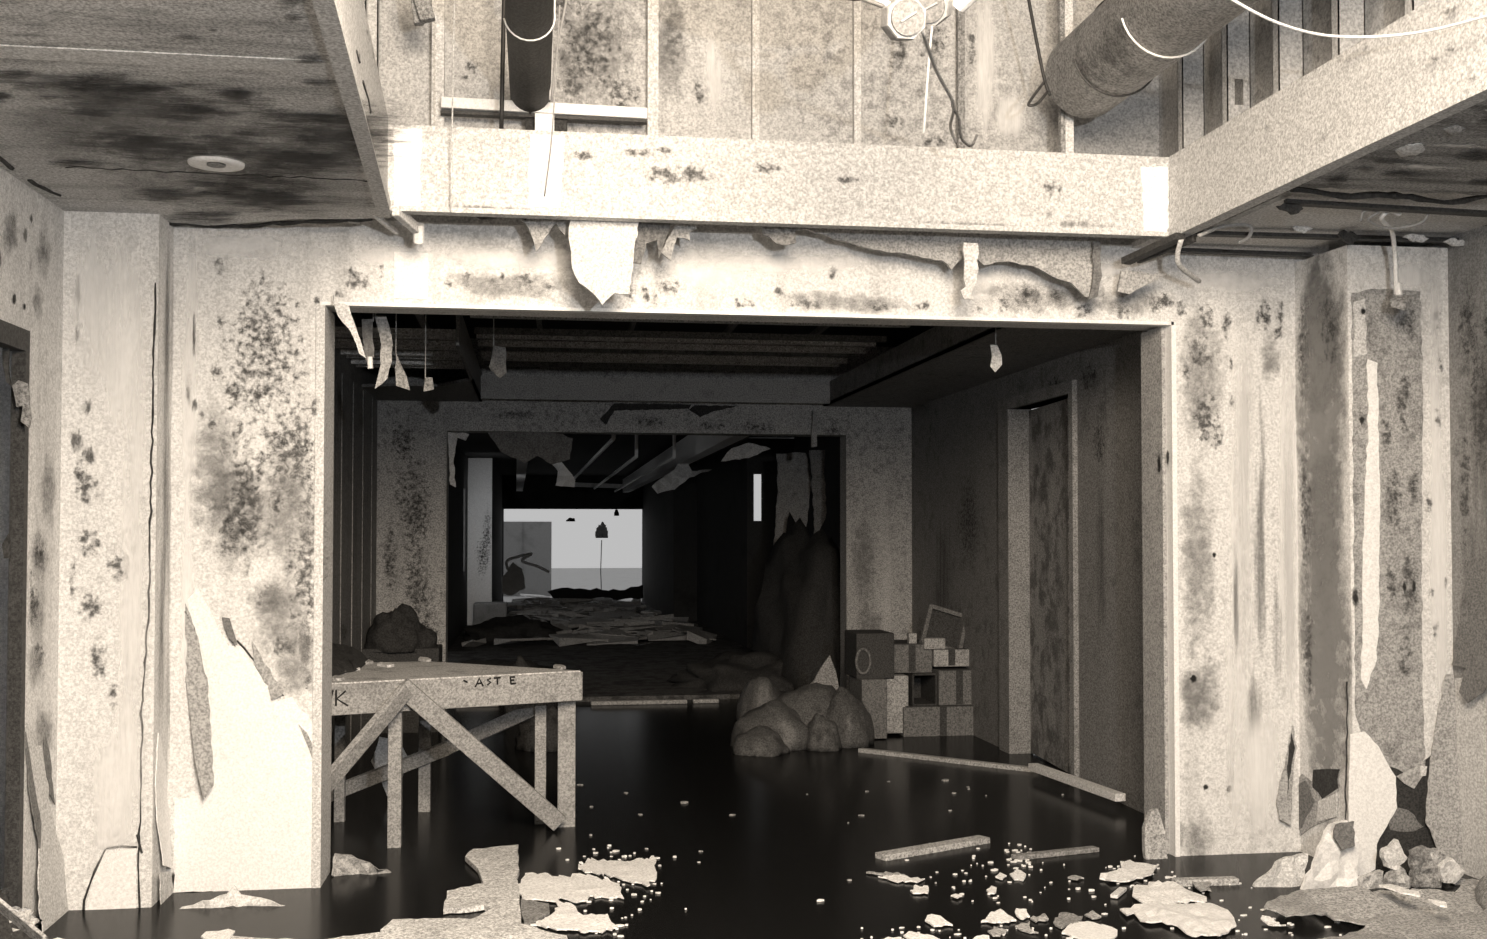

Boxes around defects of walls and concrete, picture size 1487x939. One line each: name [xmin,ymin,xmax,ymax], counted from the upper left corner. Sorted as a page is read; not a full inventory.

damp [0,71,408,222]
damp [71,430,98,503]
damp [187,268,368,689]
peeling [1353,299,1380,689]
peeling [25,732,55,848]
damp [70,587,99,617]
damp [92,648,117,696]
crack [82,283,156,910]
flaking render [159,589,313,909]
flaking render [1276,724,1445,875]
flaking render [1452,552,1487,879]